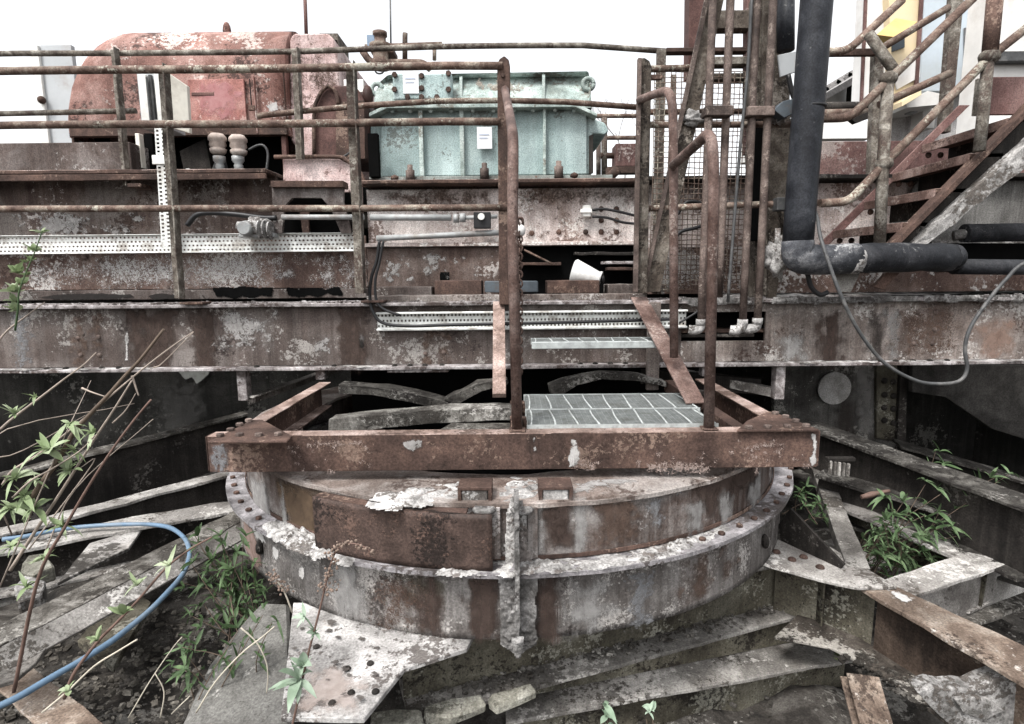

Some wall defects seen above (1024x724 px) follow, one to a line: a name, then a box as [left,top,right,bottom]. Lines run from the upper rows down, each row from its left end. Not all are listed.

corrosion [287,42,339,92]
corrosion [521,185,635,239]
corrosion [38,293,219,367]
corrosion [337,308,367,373]
corrosion [422,331,452,365]
corrosion [815,312,845,369]
corrosion [884,301,961,359]
corrosion [276,479,314,531]
peeling [253,529,279,560]